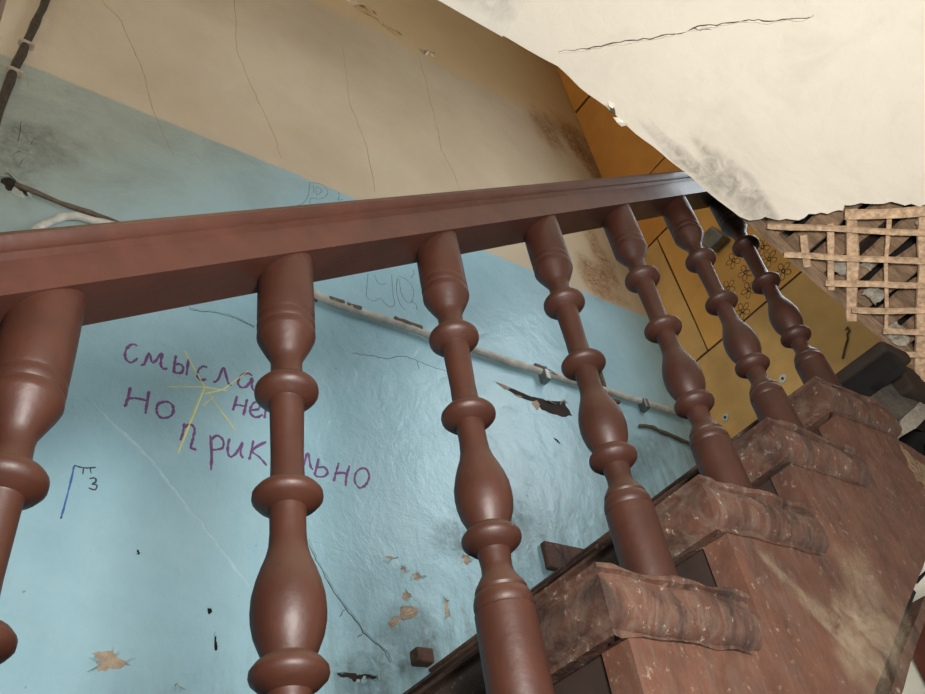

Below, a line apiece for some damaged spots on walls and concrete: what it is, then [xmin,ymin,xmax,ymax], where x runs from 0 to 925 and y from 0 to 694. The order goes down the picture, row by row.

crack [559,14,814,54]
spalling [766,202,925,382]
spalling [495,382,572,417]
spalling [871,384,925,496]
crack [307,540,392,661]
spalling [382,556,427,629]
spalling [443,596,452,621]